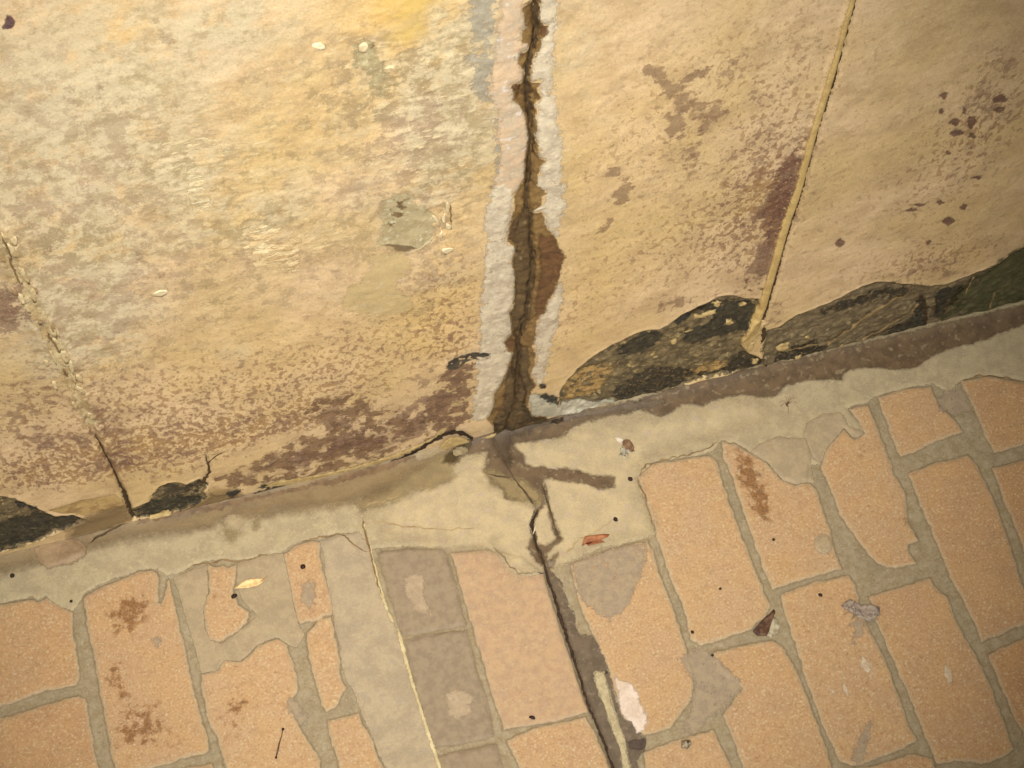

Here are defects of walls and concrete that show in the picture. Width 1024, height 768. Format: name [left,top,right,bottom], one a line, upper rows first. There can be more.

crack [760,0,856,344]
crack [2,238,20,283]
crack [47,332,69,378]
crack [390,0,614,768]
water stain [0,0,1024,573]
spalling [539,248,1024,405]
spalling [0,496,85,552]
crack [94,433,135,517]
spalling [133,479,208,520]